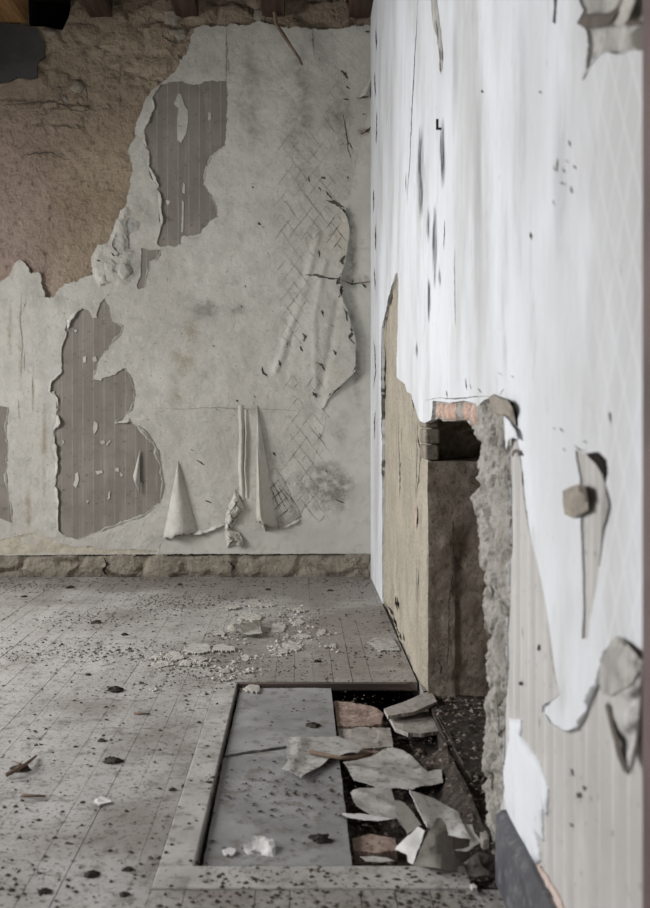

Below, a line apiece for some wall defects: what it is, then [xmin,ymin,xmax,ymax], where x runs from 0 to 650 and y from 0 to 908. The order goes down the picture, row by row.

flaking render [0,0,371,298]
peeling [0,110,371,578]
peeling [577,0,642,80]
peeling [383,274,642,908]